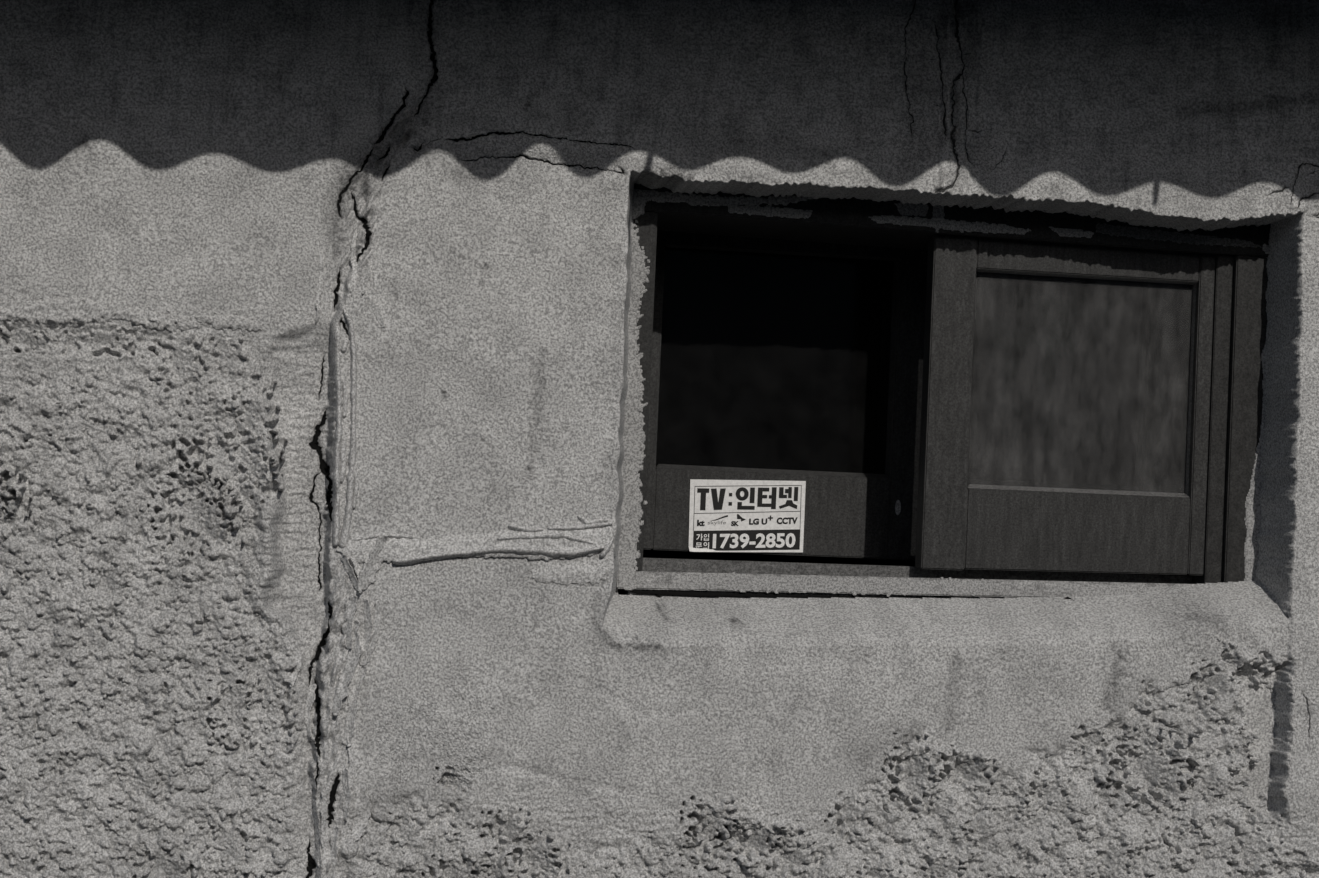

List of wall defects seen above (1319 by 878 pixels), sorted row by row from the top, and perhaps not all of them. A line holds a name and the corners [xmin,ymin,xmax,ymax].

crack [334,0,633,335]
crack [904,0,1007,193]
crack [1270,163,1319,218]
spalling [0,293,263,336]
crack [306,355,340,878]
spalling [648,797,812,854]
spalling [881,739,989,765]
spalling [1215,634,1297,786]